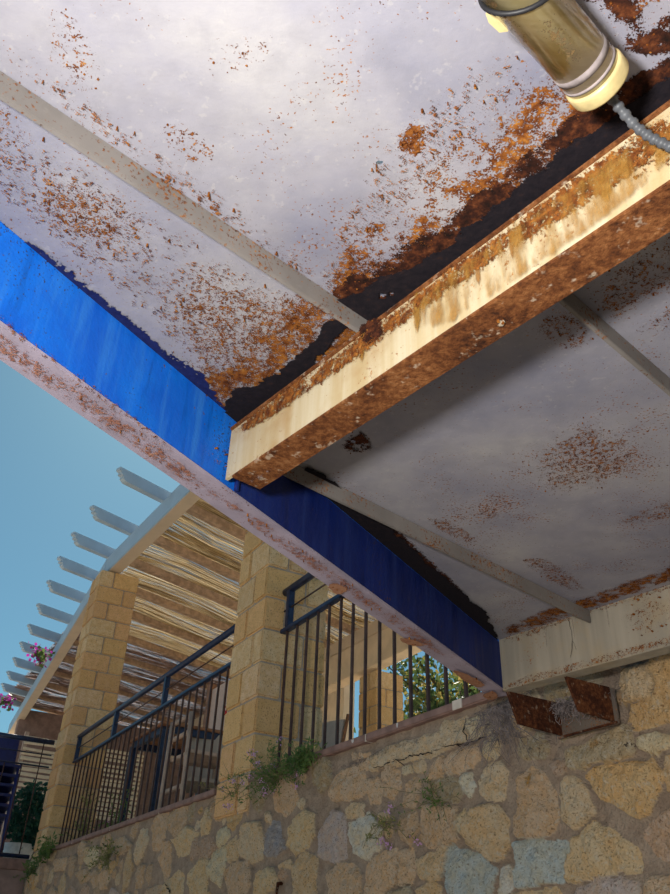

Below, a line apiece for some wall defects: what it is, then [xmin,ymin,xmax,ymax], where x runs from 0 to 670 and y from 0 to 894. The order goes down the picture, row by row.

rust [0,0,670,431]
rust [0,315,441,652]
rust [522,417,648,498]
rust [325,496,576,640]
rust [508,558,670,687]
crack [373,721,497,768]